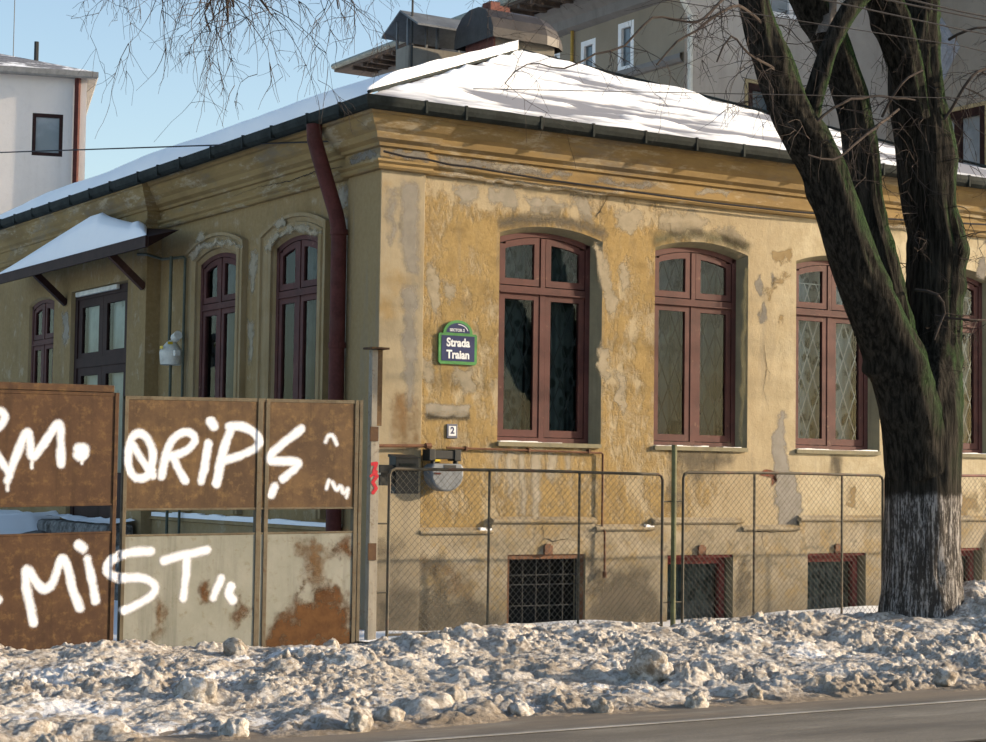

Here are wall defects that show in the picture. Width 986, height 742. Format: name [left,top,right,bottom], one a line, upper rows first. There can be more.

peeling [387,183,456,409]
peeling [594,243,630,315]
peeling [755,249,792,323]
peeling [596,347,627,413]
peeling [760,411,803,525]
corrosion [200,582,209,602]
corrosion [233,605,248,622]
corrosion [265,538,356,647]
water stain [379,587,494,631]